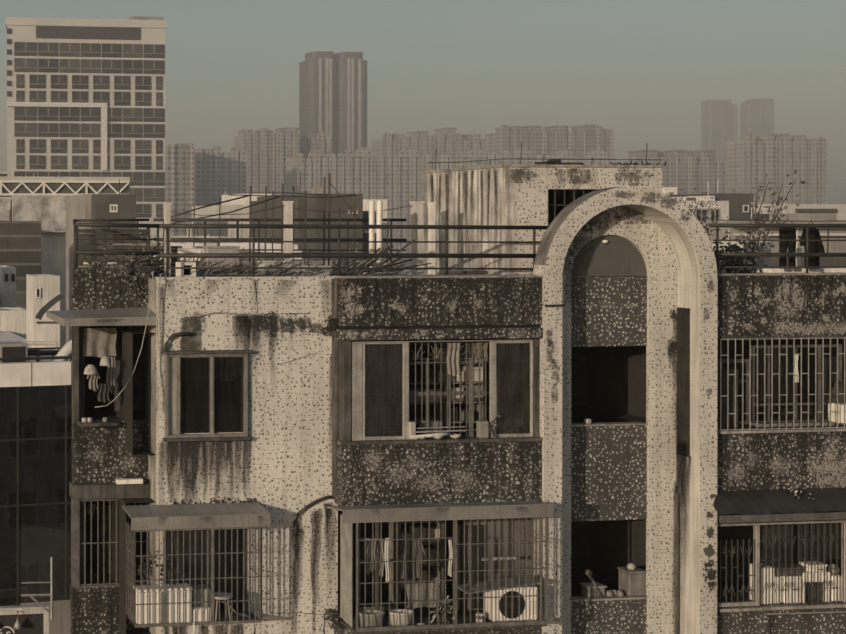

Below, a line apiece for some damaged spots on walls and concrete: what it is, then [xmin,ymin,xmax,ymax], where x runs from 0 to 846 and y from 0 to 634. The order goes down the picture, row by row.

damp [431,170,497,225]
damp [718,277,840,302]
damp [233,312,332,350]
damp [161,440,262,506]
damp [674,399,691,509]
damp [290,504,334,597]